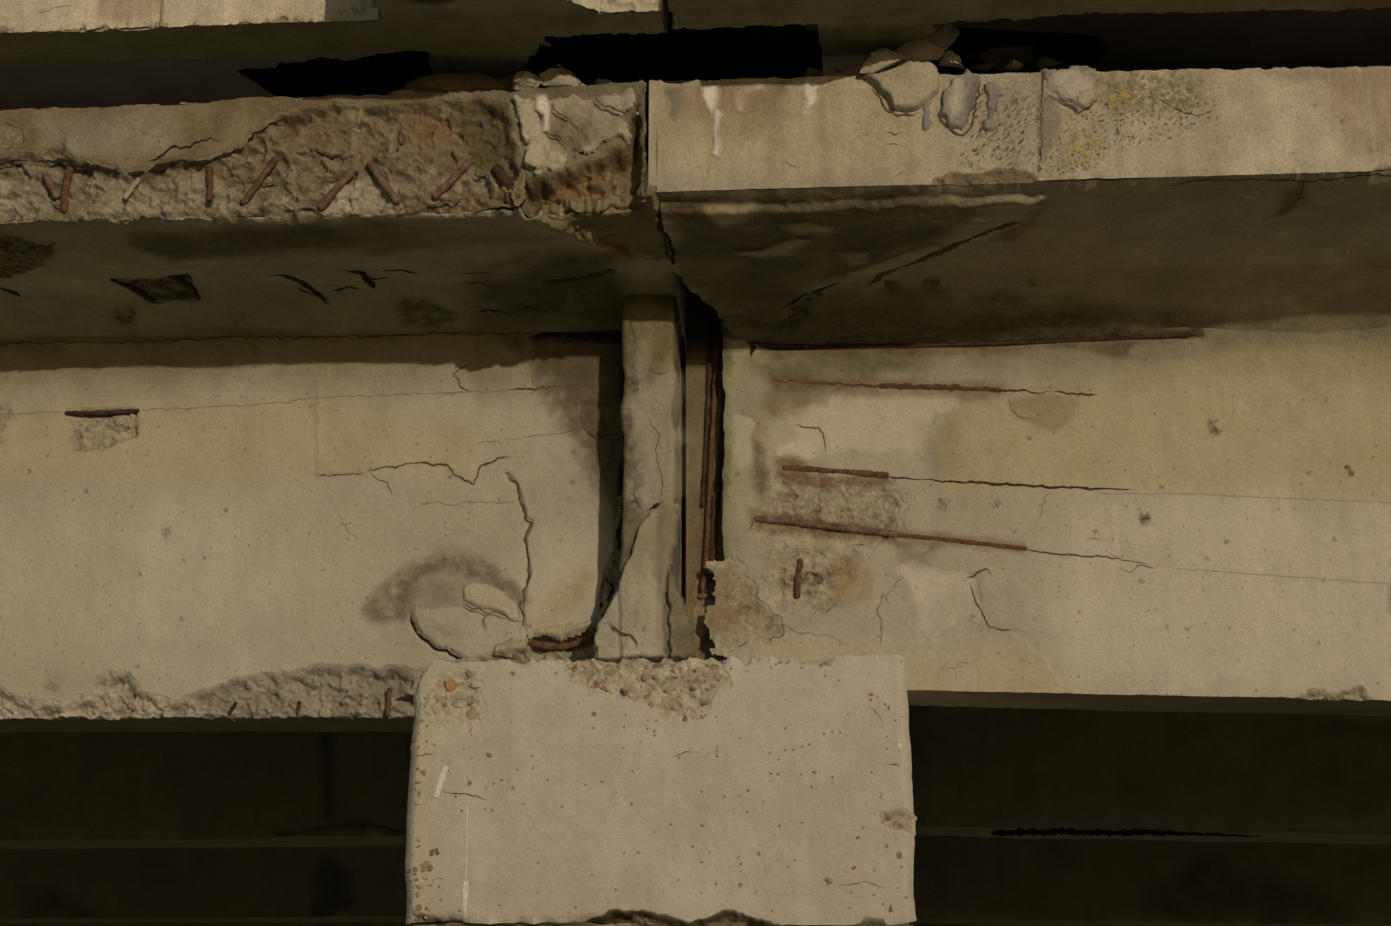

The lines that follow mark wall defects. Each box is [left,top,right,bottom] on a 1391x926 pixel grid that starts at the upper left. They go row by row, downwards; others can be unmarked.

water stain [666,79,764,156]
water stain [803,81,818,114]
spalling [0,68,669,278]
spalling [110,273,201,303]
crack [790,222,1021,307]
crack [0,269,670,639]
crack [410,616,461,659]
spalling [0,315,1199,923]
crack [966,568,1009,631]
crack [991,827,1263,837]